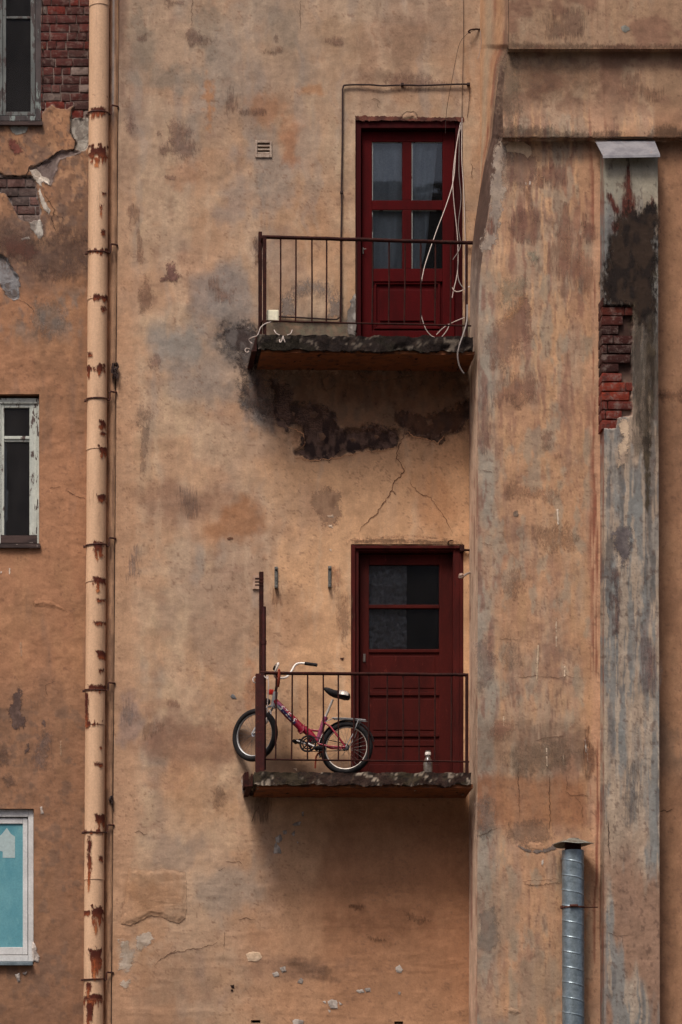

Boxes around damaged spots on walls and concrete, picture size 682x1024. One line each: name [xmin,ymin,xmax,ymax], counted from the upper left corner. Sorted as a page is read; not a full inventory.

flaking render [0,0,89,240]
flaking render [0,254,21,300]
flaking render [256,294,536,463]
flaking render [598,298,633,434]
crack [360,423,451,530]
damp [639,638,661,697]
damp [477,906,498,953]